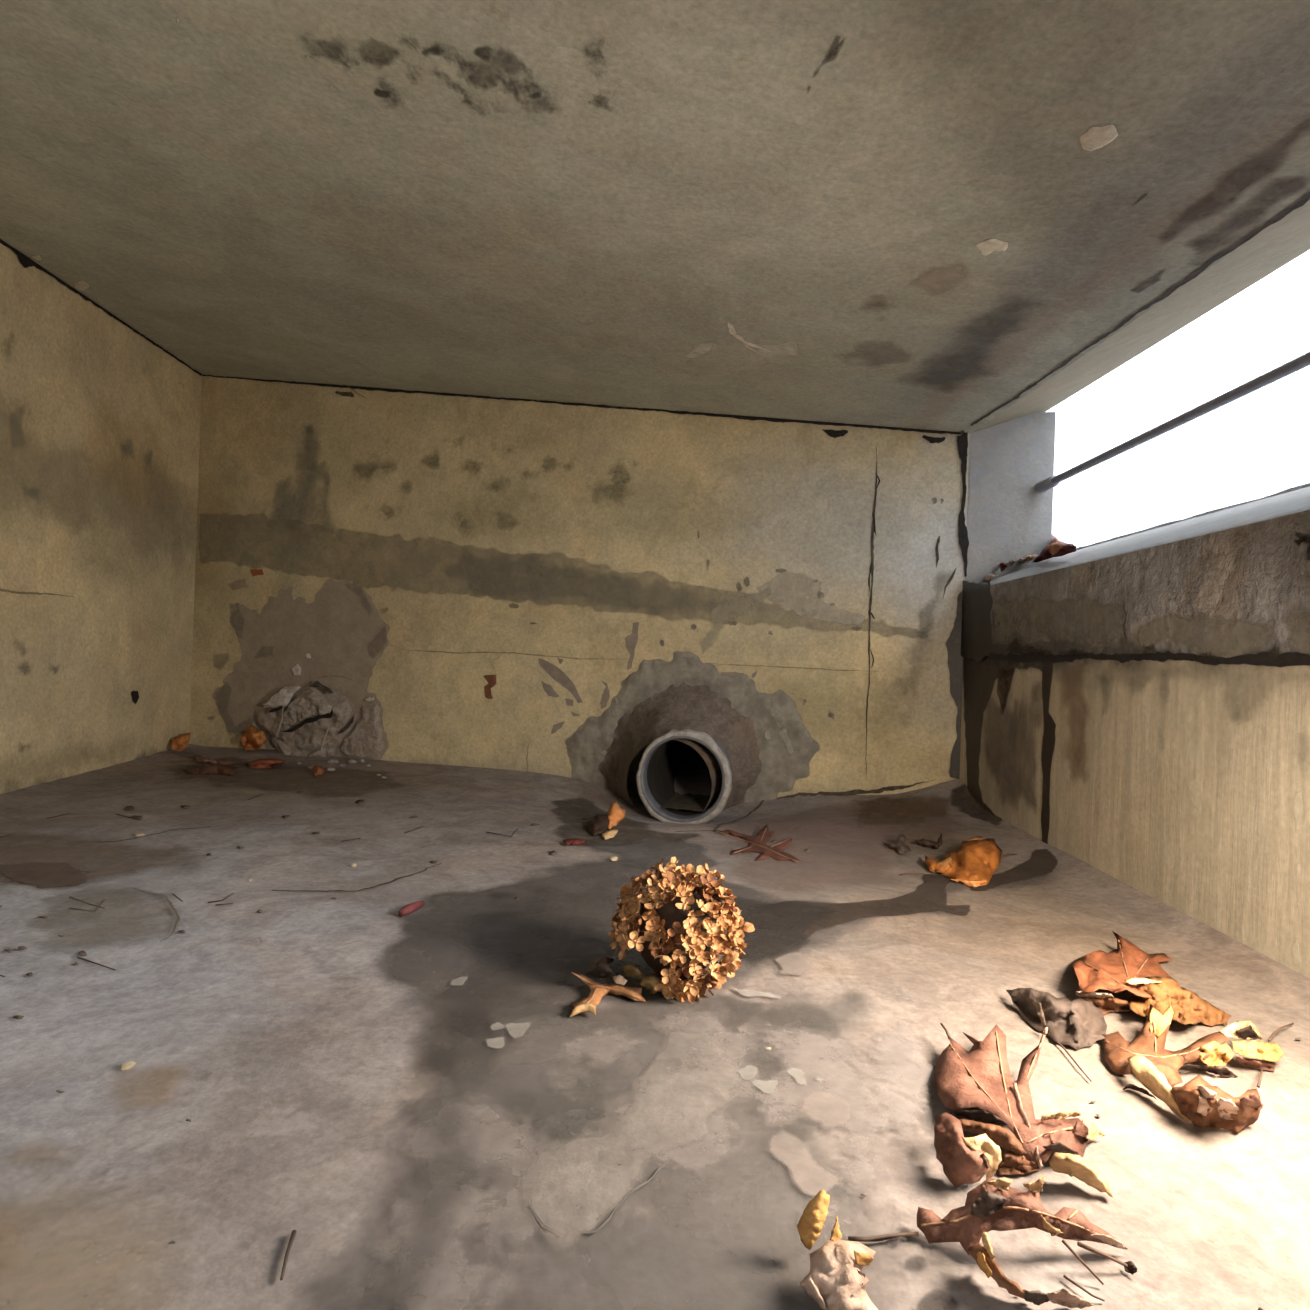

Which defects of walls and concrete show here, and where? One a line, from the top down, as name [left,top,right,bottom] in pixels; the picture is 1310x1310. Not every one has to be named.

damp [460,48,523,88]
damp [1161,125,1310,250]
damp [1131,270,1164,292]
damp [919,304,1030,390]
damp [199,427,815,627]
crack [0,192,1310,832]
peeling [212,579,390,750]
spalling [539,658,582,734]
damp [946,580,1142,815]
damp [696,849,1058,980]
damp [320,860,936,1310]
damp [921,1290,957,1310]